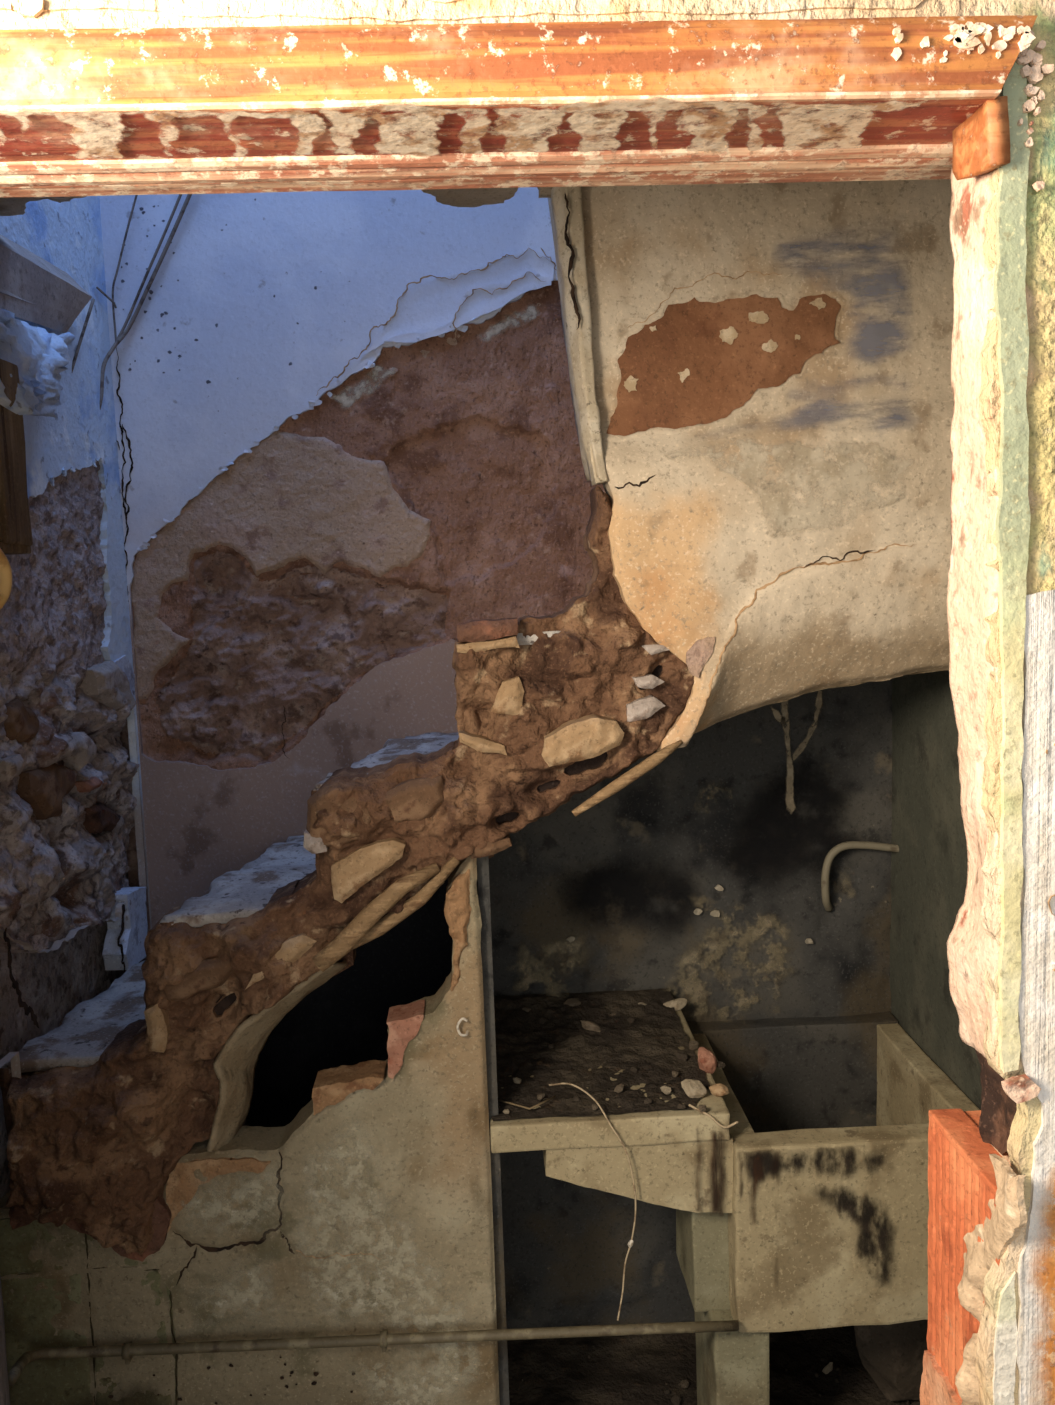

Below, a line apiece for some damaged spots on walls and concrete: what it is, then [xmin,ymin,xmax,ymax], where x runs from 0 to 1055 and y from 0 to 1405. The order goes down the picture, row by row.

peeling [0,0,923,23]
peeling [891,28,903,61]
crack [316,193,581,396]
peeling [601,289,847,442]
peeling [920,6,1055,594]
flaking render [0,247,607,953]
crack [695,543,914,730]
flaking render [444,869,472,992]
spalling [214,993,237,1015]
flaking render [312,1000,425,1115]
flaking render [166,1157,271,1233]
crack [173,1152,379,1285]